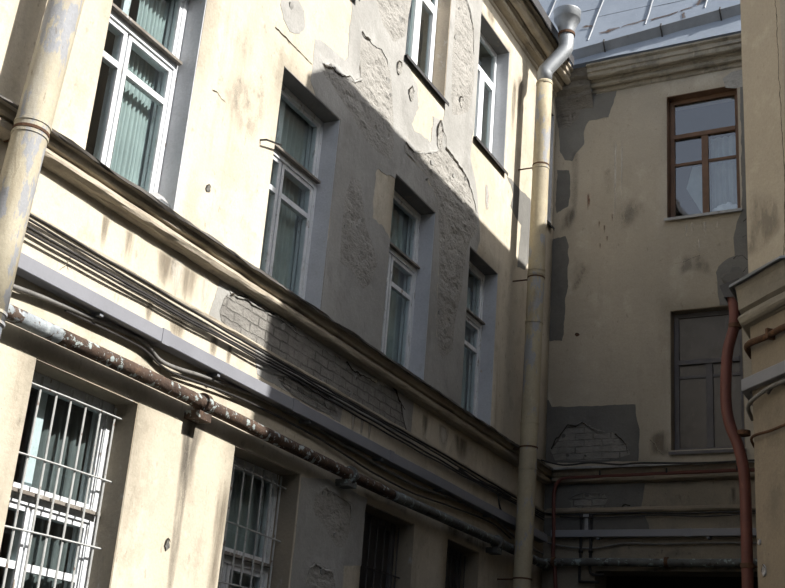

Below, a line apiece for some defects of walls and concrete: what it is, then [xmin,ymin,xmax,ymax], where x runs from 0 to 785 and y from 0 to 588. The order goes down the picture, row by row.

flaking render [376,0,411,42]
rust [600,0,701,33]
flaking render [322,33,402,160]
flaking render [340,177,377,289]
flaking render [405,120,478,358]
flaking render [220,291,405,428]